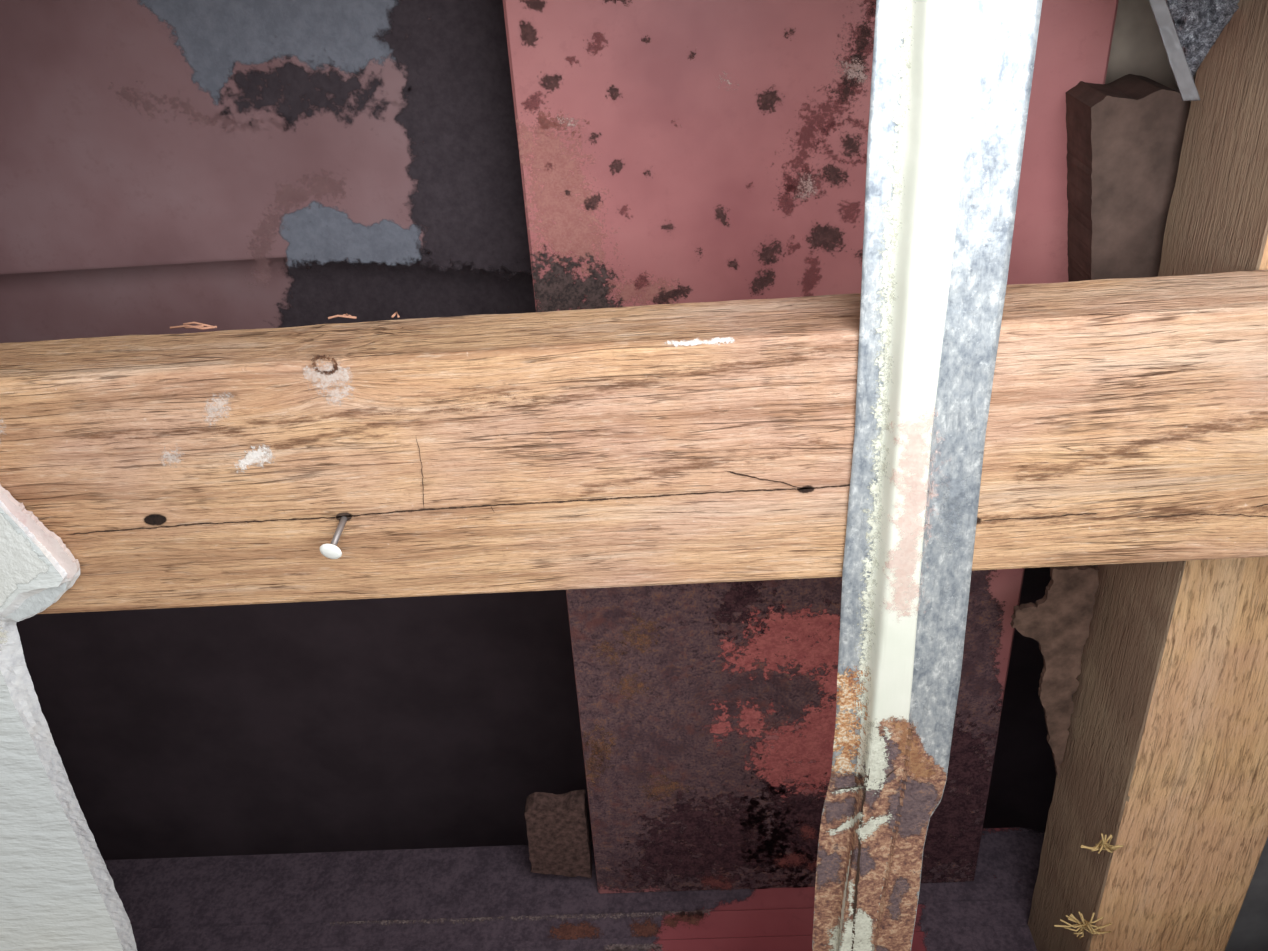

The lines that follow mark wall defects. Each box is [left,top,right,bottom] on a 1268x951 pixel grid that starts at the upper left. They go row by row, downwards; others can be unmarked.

rust [519,0,545,47]
rust [523,32,608,113]
rust [757,87,785,115]
rust [773,0,876,215]
peeling [139,0,679,328]
rust [584,192,603,210]
rust [635,272,693,304]
rust [750,202,863,297]
peeling [702,0,911,802]
rust [104,569,1045,951]
peeling [773,812,894,871]
peeling [825,881,876,951]